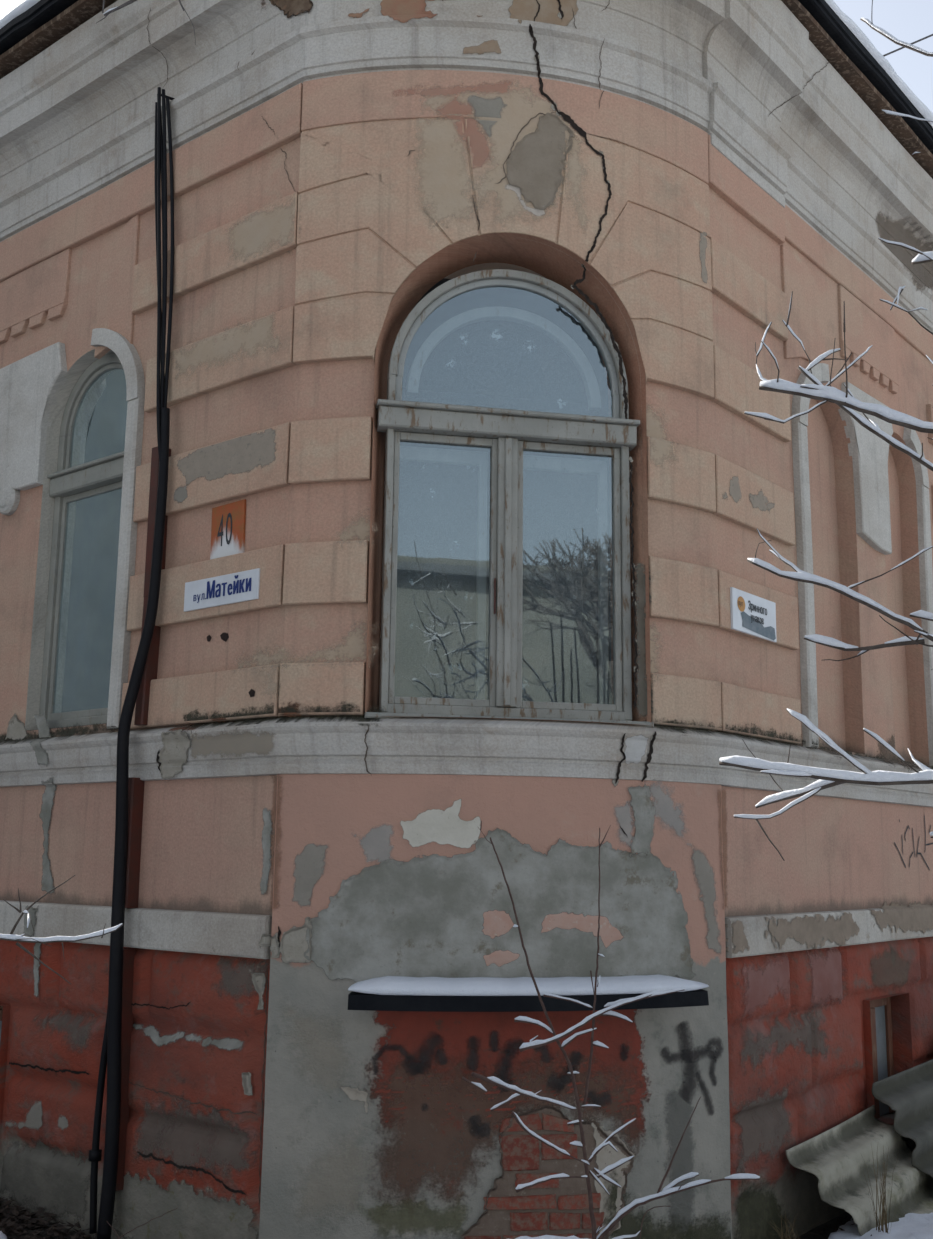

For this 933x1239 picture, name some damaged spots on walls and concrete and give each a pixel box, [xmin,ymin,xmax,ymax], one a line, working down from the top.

flaking render [269,0,313,18]
peeling [348,0,443,23]
peeling [508,0,578,26]
peeling [425,83,575,223]
crack [472,0,628,419]
peeling [177,429,276,485]
crack [612,457,657,786]
peeling [400,799,481,848]
peeling [541,912,624,948]
peeling [760,912,860,949]
peeling [867,901,933,933]
flaking render [460,1105,634,1239]